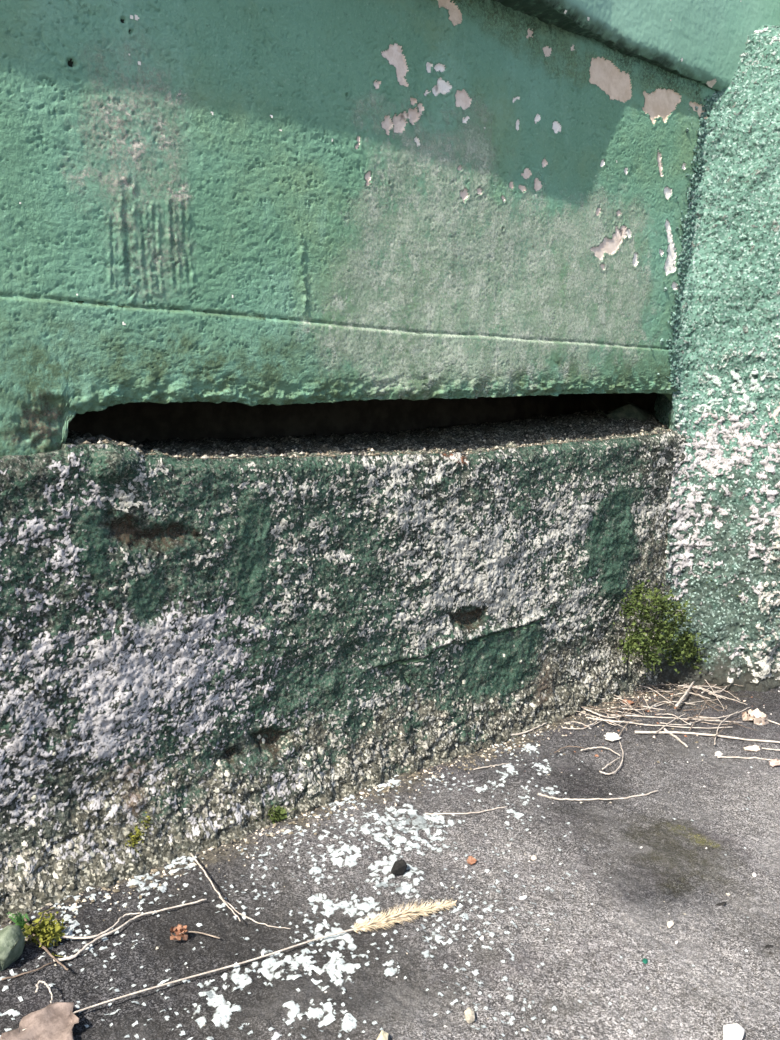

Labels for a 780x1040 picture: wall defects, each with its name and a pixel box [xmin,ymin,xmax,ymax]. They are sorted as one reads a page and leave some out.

peeling [438,0,462,26]
peeling [740,26,780,83]
peeling [381,43,472,147]
peeling [534,114,562,133]
peeling [589,57,708,124]
peeling [657,150,672,199]
peeling [590,210,631,270]
peeling [659,219,688,290]
crack [378,619,543,683]
water stain [269,641,668,811]
water stain [0,761,257,905]